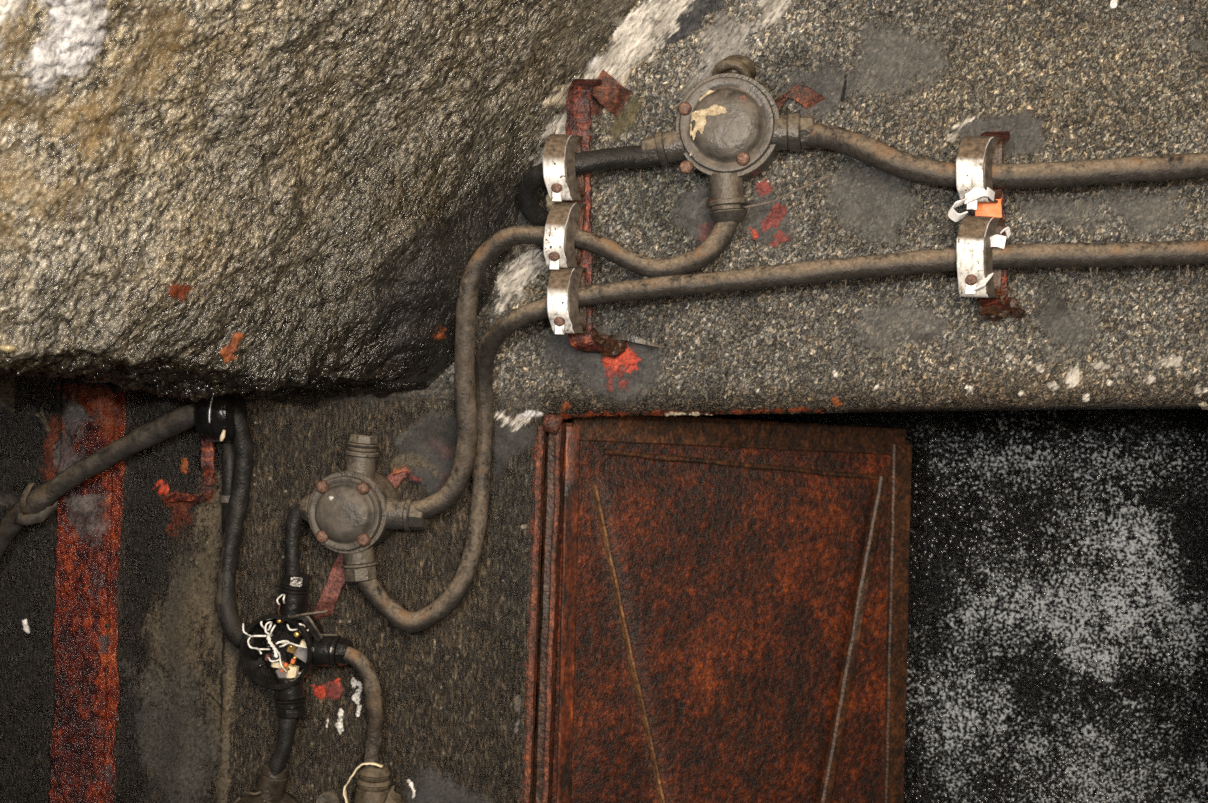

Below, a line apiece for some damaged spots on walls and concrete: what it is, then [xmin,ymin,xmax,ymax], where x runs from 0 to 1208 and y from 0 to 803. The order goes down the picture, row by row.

corrosion [46,378,126,443]
corrosion [40,415,60,482]
damp [906,411,1208,803]